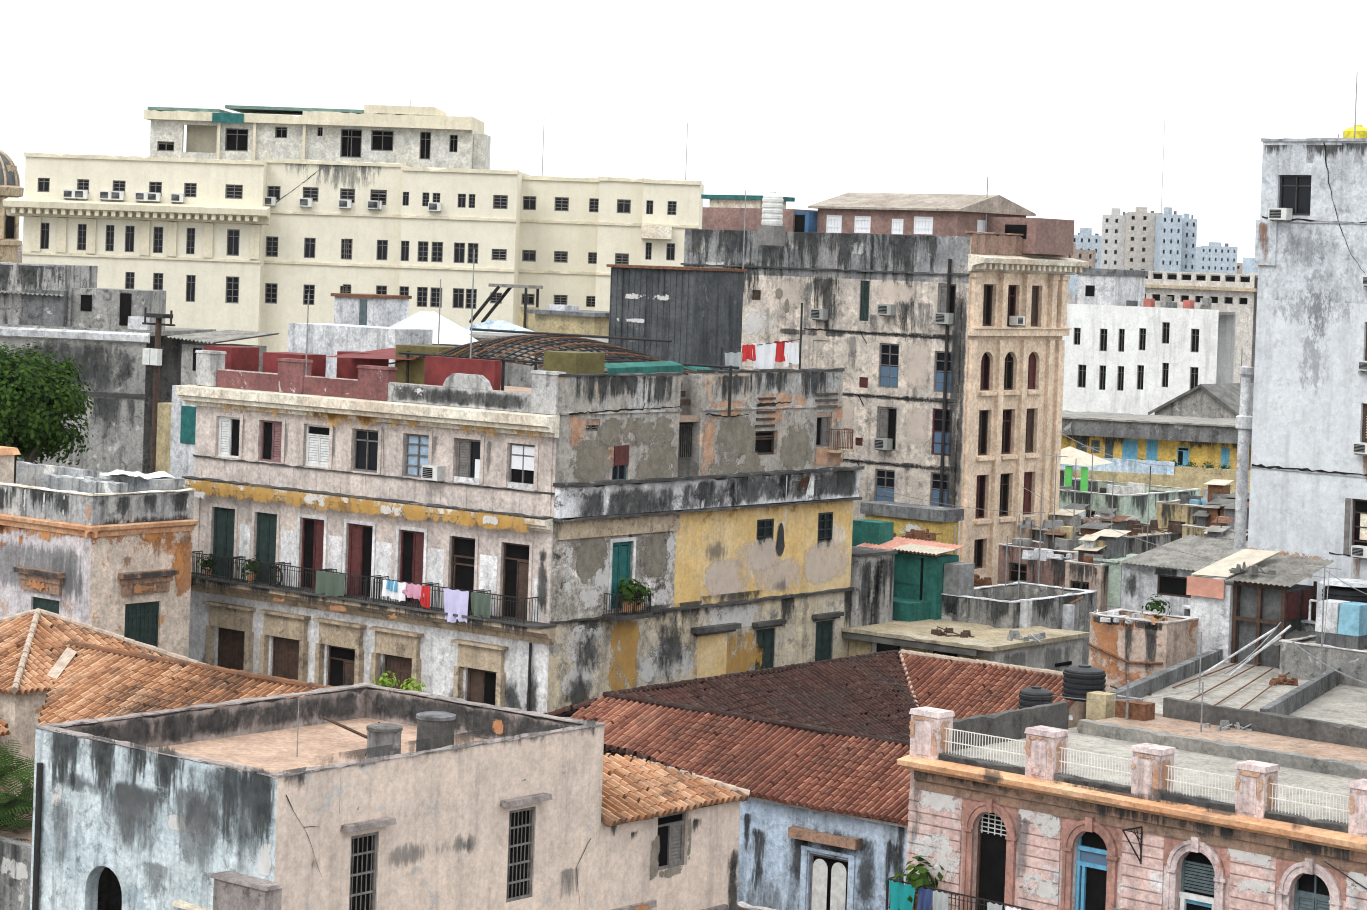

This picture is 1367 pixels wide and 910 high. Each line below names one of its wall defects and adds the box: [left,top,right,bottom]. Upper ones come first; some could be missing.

crack [1262,142,1366,273]
water stain [576,229,967,521]
flaking render [701,392,844,492]
water stain [370,618,600,750]
peeling [560,531,697,696]
water stain [648,590,759,682]
peeling [707,538,847,674]
water stain [51,680,357,850]
water stain [331,739,430,767]
peeling [1018,809,1061,839]
peeling [1227,848,1273,896]
peeling [1346,871,1367,892]